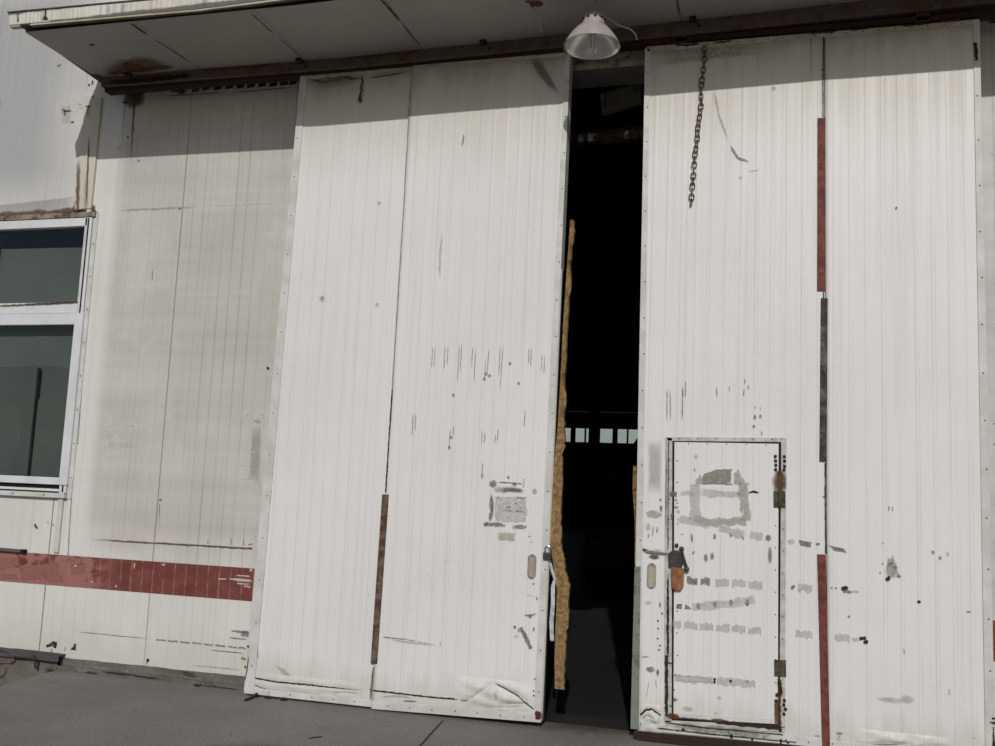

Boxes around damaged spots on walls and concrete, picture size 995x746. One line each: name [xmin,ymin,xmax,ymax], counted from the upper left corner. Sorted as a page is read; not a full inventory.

rust [109,58,188,138]
peeling [484,476,537,529]
peeling [679,469,771,541]
peeling [687,576,762,606]
peeling [684,622,761,634]